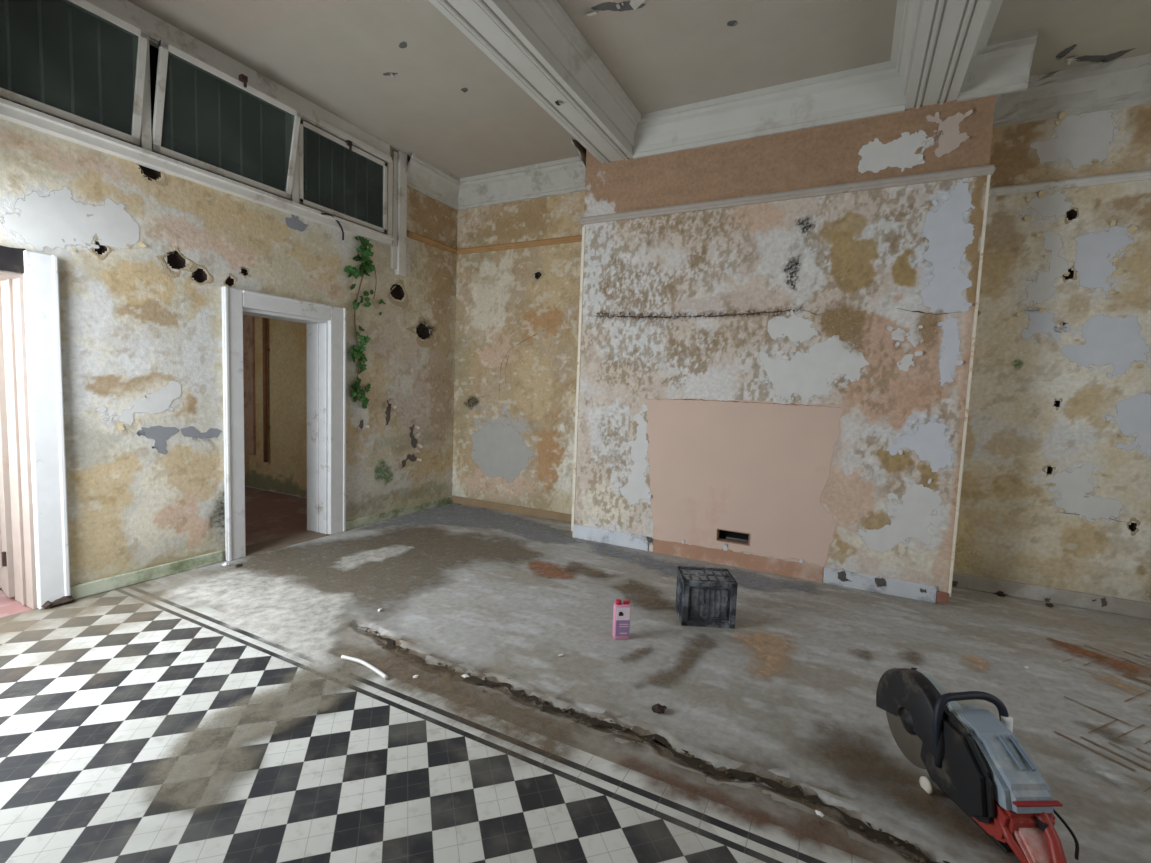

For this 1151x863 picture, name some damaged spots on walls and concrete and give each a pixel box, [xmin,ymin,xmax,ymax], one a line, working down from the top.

peeling [583,0,646,16]
peeling [1056,44,1135,65]
peeling [858,109,973,173]
peeling [1030,110,1125,168]
flaking render [1064,207,1079,224]
crack [614,310,827,318]
peeling [886,325,924,372]
crack [896,307,959,315]
peeling [916,178,981,386]
peeling [1017,307,1150,378]
peeling [1061,220,1138,295]
crack [356,624,950,863]